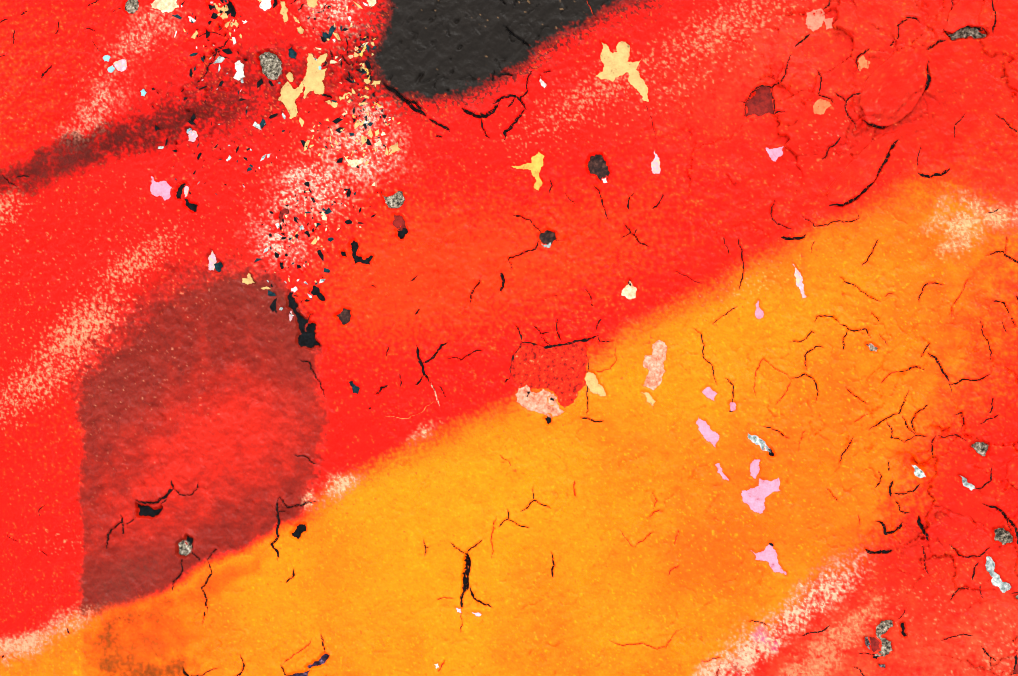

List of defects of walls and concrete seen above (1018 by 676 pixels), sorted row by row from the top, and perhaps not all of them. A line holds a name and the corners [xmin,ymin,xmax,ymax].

peeling [150,0,450,348]
crack [462,0,550,140]
peeling [512,152,544,190]
peeling [596,41,649,102]
crack [770,17,950,250]
crack [924,0,996,91]
peeling [642,340,667,406]
peeling [741,434,780,514]
crack [695,237,894,412]
crack [839,296,1018,573]
crack [423,489,550,632]
peeling [750,543,786,575]